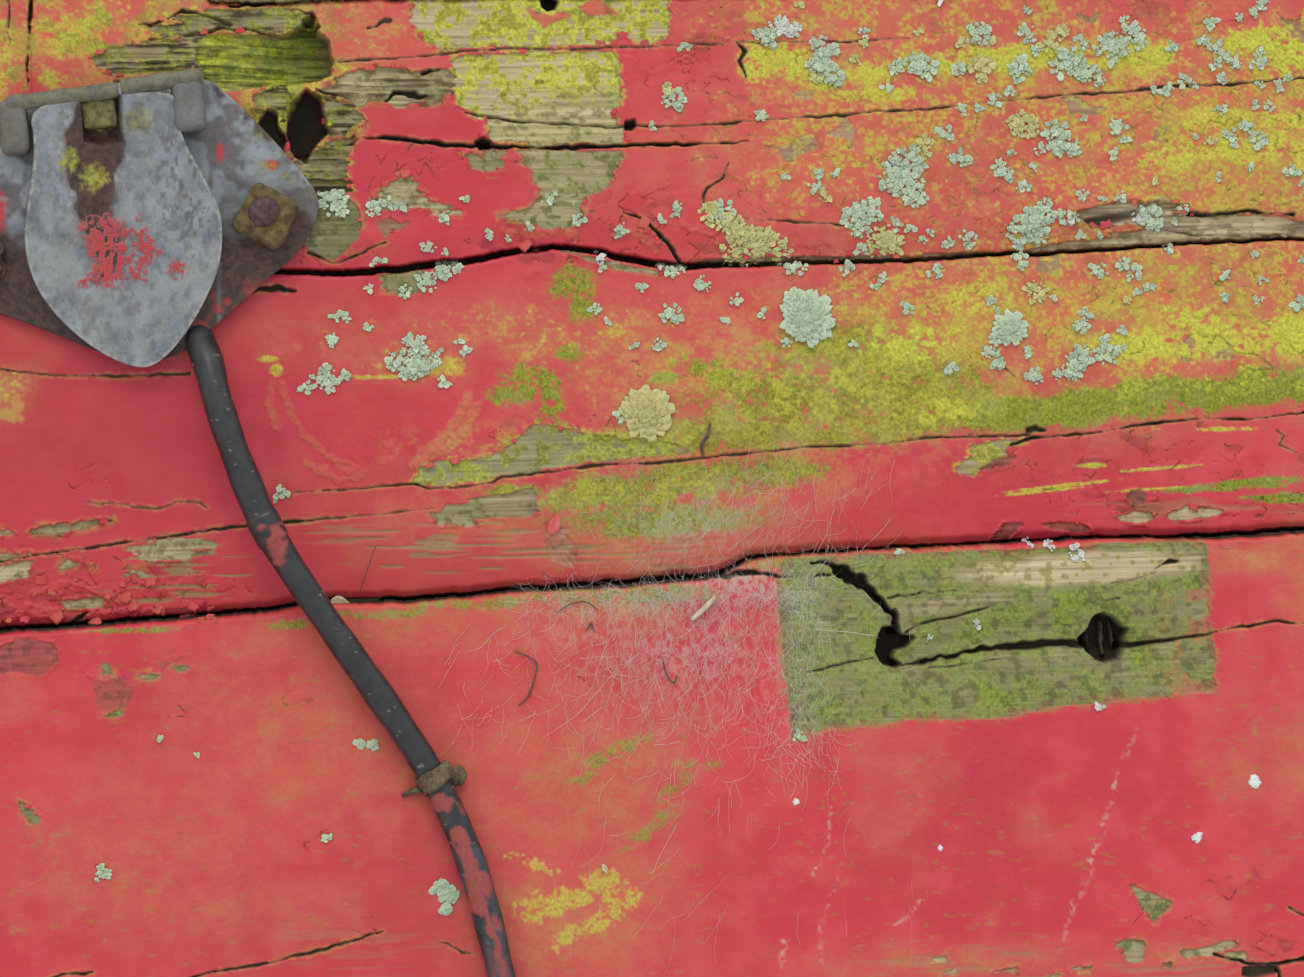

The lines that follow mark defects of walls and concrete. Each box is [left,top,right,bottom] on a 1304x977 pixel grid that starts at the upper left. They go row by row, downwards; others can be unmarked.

peeling [91,9,286,83]
peeling [407,0,674,230]
peeling [301,168,463,263]
crack [1165,208,1297,240]
crack [282,411,1304,526]
peeling [0,517,119,587]
crack [0,500,248,564]
peeling [123,532,221,578]
crack [713,557,1304,675]
crack [193,931,384,977]
peeling [1116,938,1250,970]
crack [1212,953,1304,977]